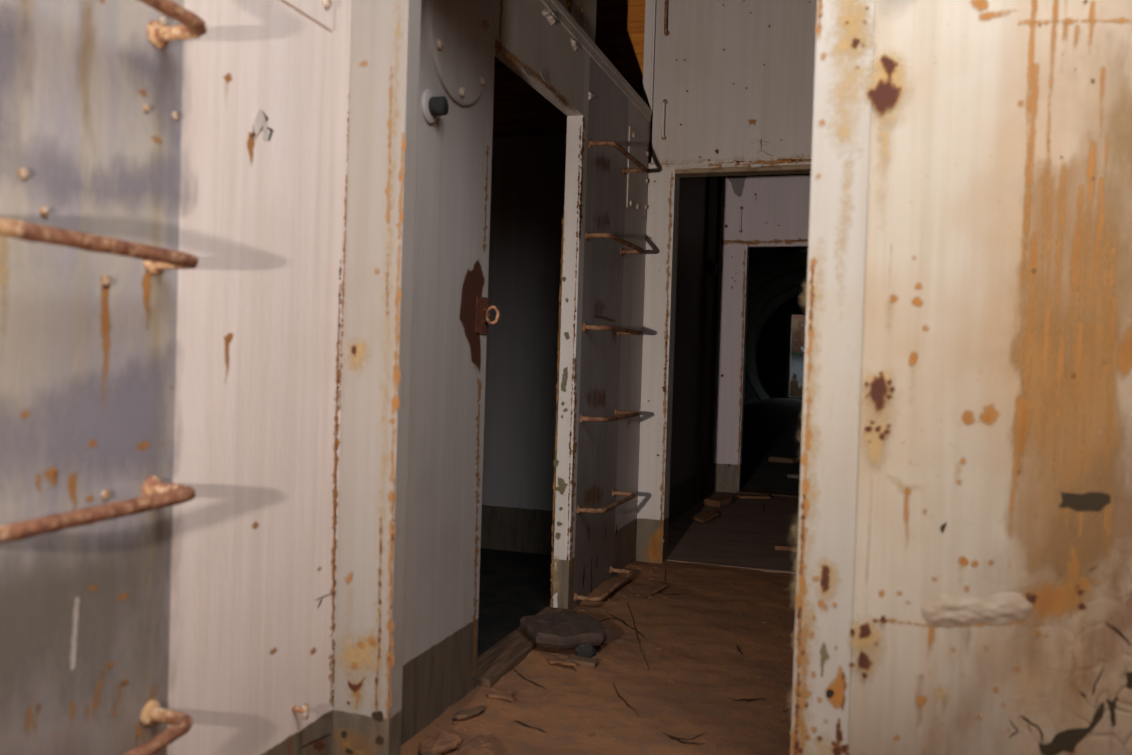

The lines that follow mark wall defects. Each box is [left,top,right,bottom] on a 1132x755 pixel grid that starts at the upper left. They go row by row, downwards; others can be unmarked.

corrosion [838,54,905,141]
corrosion [101,277,111,399]
corrosion [142,272,151,317]
corrosion [1010,0,1132,637]
corrosion [318,76,406,719]
corrosion [863,371,895,463]
corrosion [962,406,997,425]
corrosion [791,259,886,755]
spalling [1058,487,1111,537]
crack [1105,622,1131,645]
spalling [1020,672,1132,755]
crack [1080,667,1103,697]